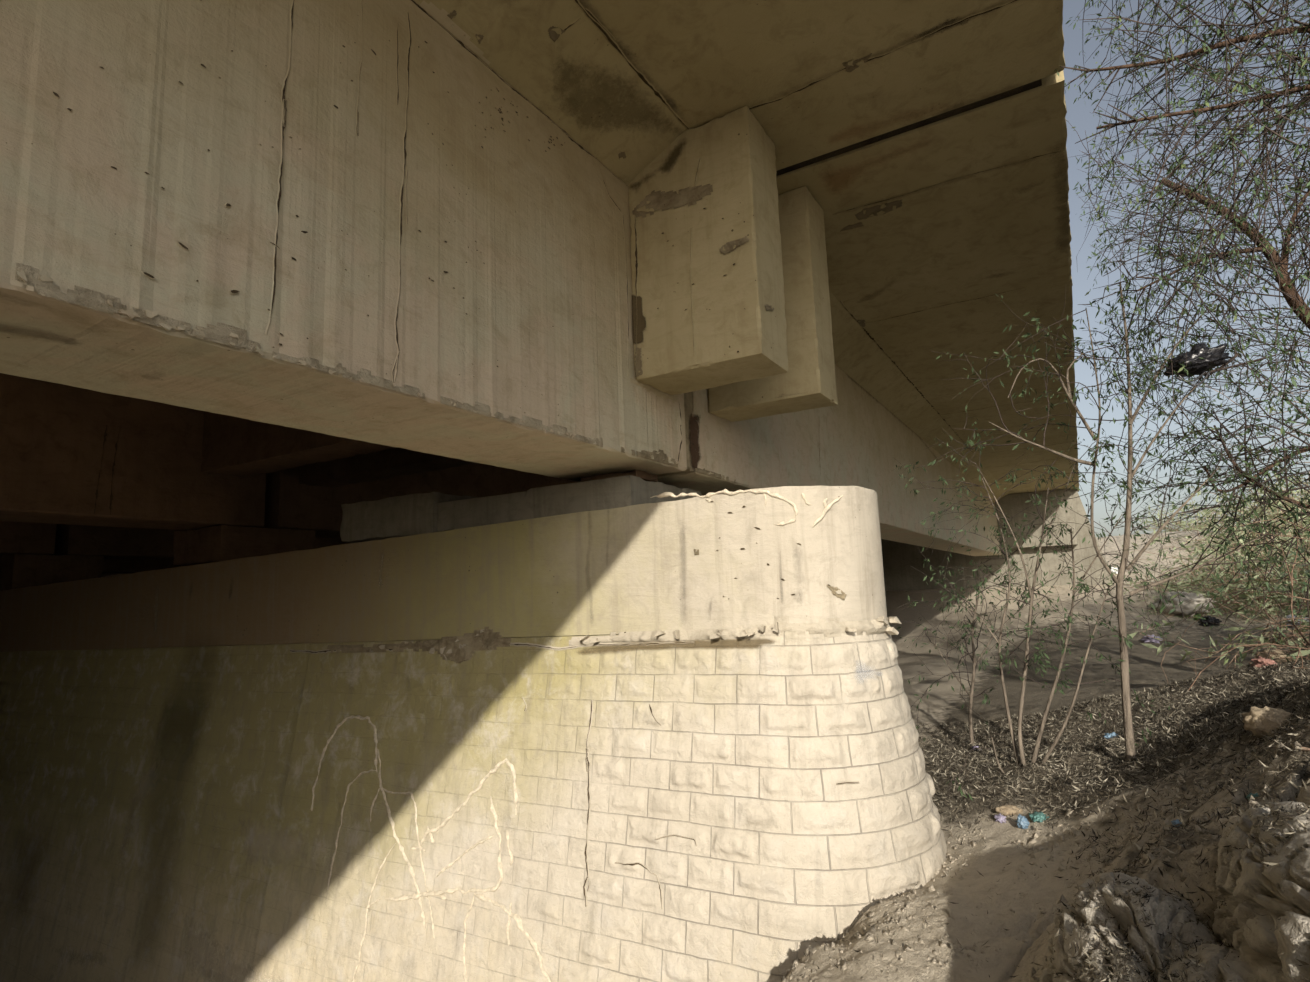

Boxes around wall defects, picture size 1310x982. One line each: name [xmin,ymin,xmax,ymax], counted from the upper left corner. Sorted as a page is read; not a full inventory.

crack [563,0,691,130]
crack [265,0,294,335]
crack [391,0,639,383]
spalling [632,184,713,218]
spalling [15,262,603,447]
spalling [621,447,736,483]
rust [689,414,700,468]
spalling [327,627,511,663]
crack [583,700,697,909]